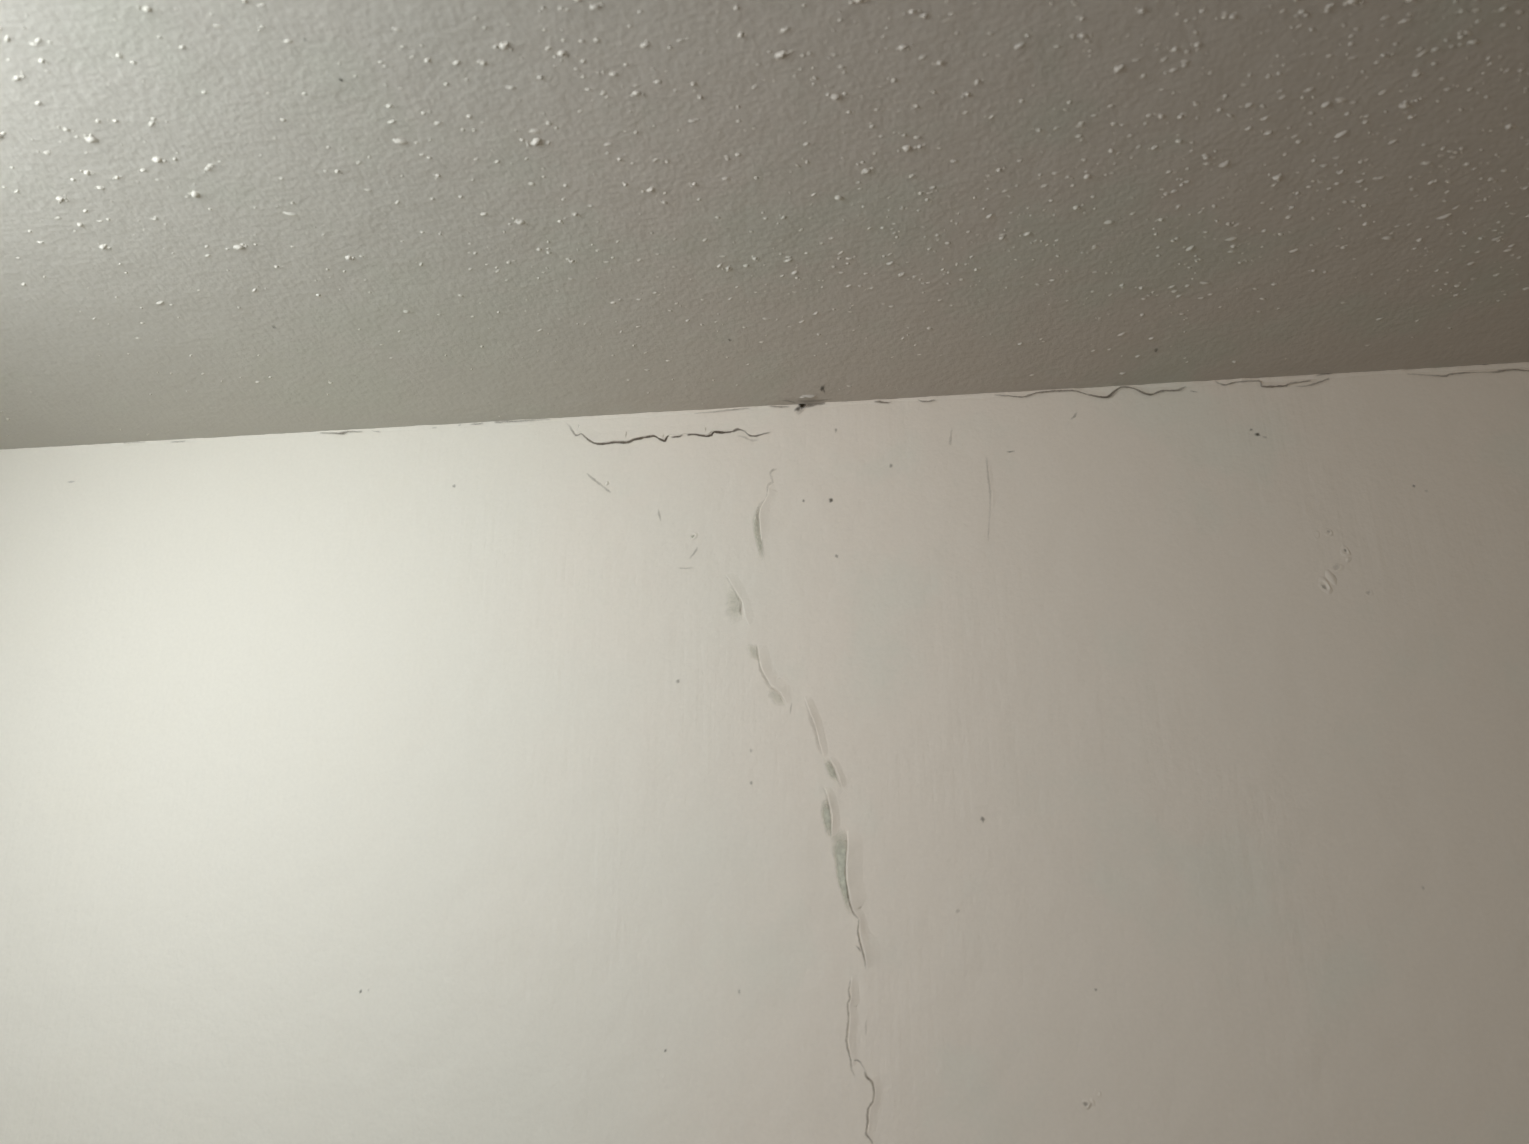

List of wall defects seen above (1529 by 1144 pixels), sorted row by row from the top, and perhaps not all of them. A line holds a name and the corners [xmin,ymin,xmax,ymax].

crack [1003,385,1182,398]
crack [1223,378,1322,387]
crack [571,422,761,445]
crack [755,483,778,544]
crack [726,573,883,1144]